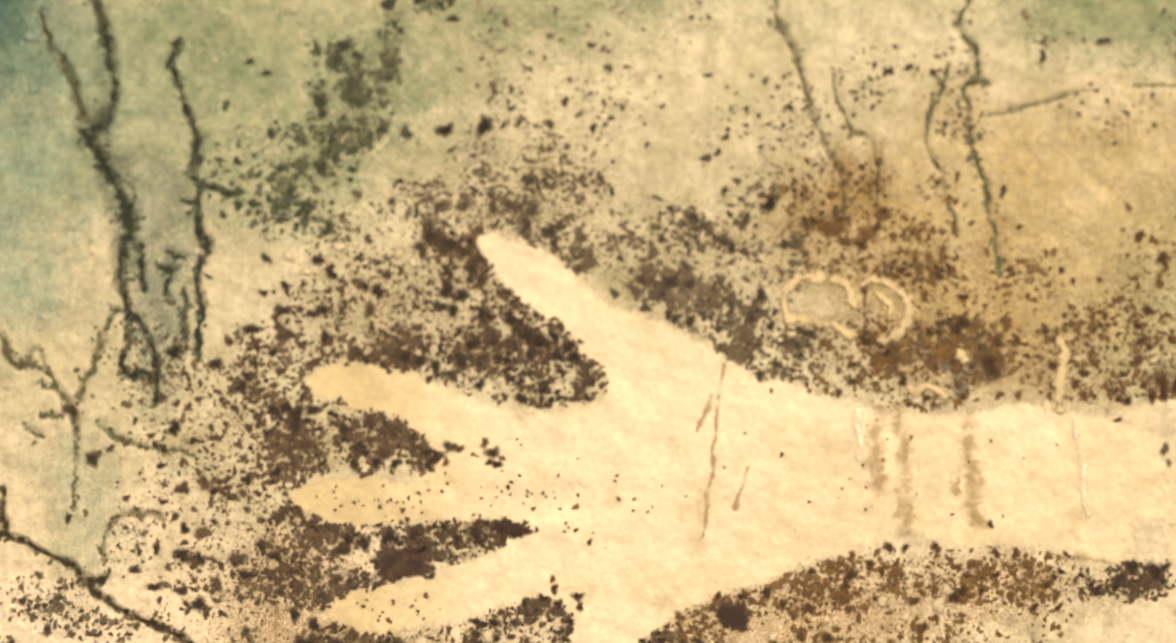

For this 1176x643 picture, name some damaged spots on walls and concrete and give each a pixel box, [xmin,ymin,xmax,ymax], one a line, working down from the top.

crack [767,0,884,219]
crack [924,0,1099,276]
crack [1132,81,1174,89]
crack [0,0,245,515]
crack [0,485,193,643]